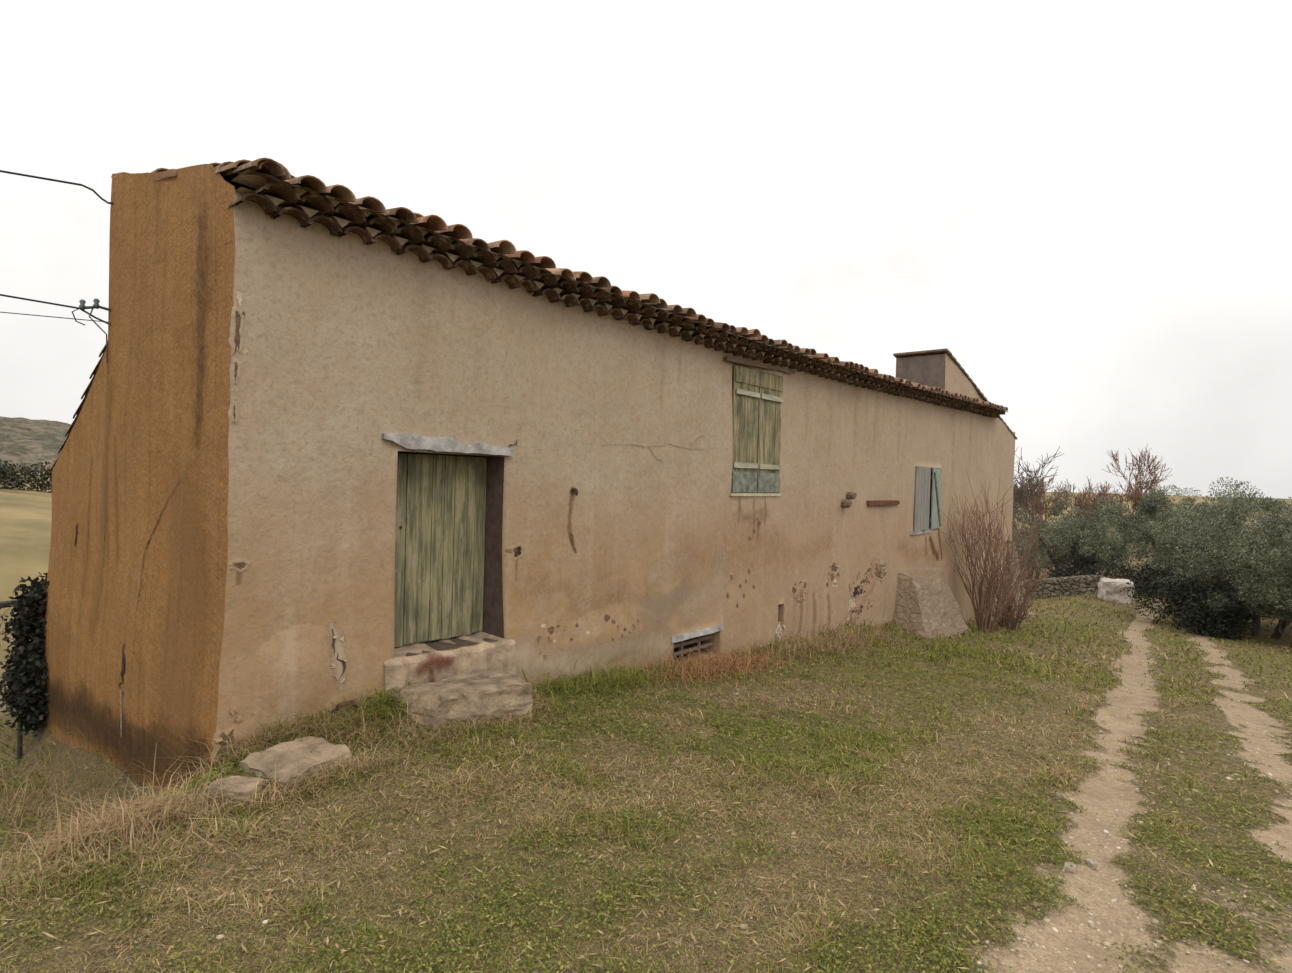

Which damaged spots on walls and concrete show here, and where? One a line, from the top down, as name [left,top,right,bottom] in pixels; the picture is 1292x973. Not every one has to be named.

corrosion [568,487,576,553]
spalling [774,560,888,641]
peeling [329,622,346,689]
peeling [515,614,671,678]